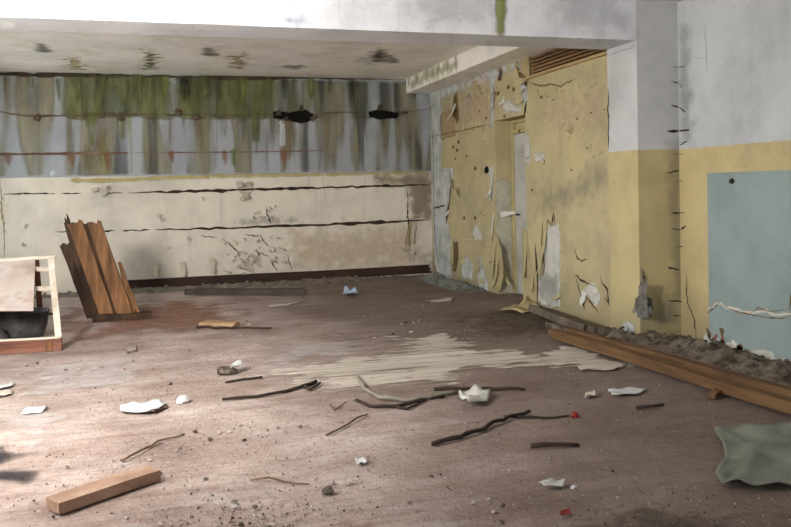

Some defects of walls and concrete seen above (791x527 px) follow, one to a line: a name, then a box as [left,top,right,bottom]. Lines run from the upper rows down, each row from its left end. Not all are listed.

damp [4,76,60,177]
damp [67,74,431,217]
peeling [471,57,531,128]
crack [667,105,689,173]
crack [105,184,426,264]
peeling [402,86,561,308]
peeling [575,275,601,313]
spalling [632,267,653,319]
crack [668,267,696,330]
peeling [706,295,791,319]